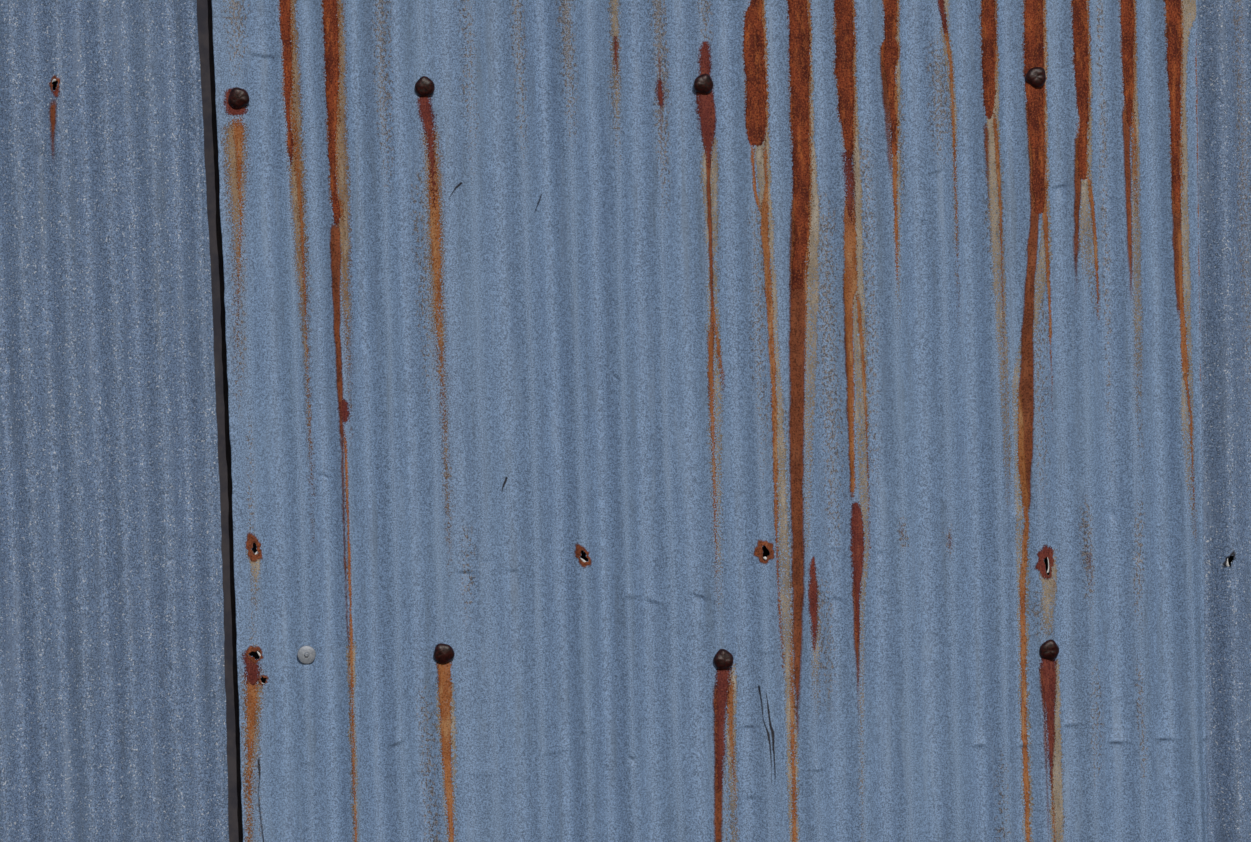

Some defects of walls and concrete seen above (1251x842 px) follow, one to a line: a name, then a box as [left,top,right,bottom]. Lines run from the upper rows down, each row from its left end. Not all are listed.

rust [277,0,315,496]
rust [321,0,359,842]
rust [417,96,452,576]
rust [694,42,726,611]
rust [742,0,821,842]
rust [833,0,871,838]
rust [879,0,902,327]
rust [979,0,1065,842]
rust [1070,0,1101,315]
rust [1118,0,1144,410]
rust [1163,0,1202,541]
rust [713,664,740,842]